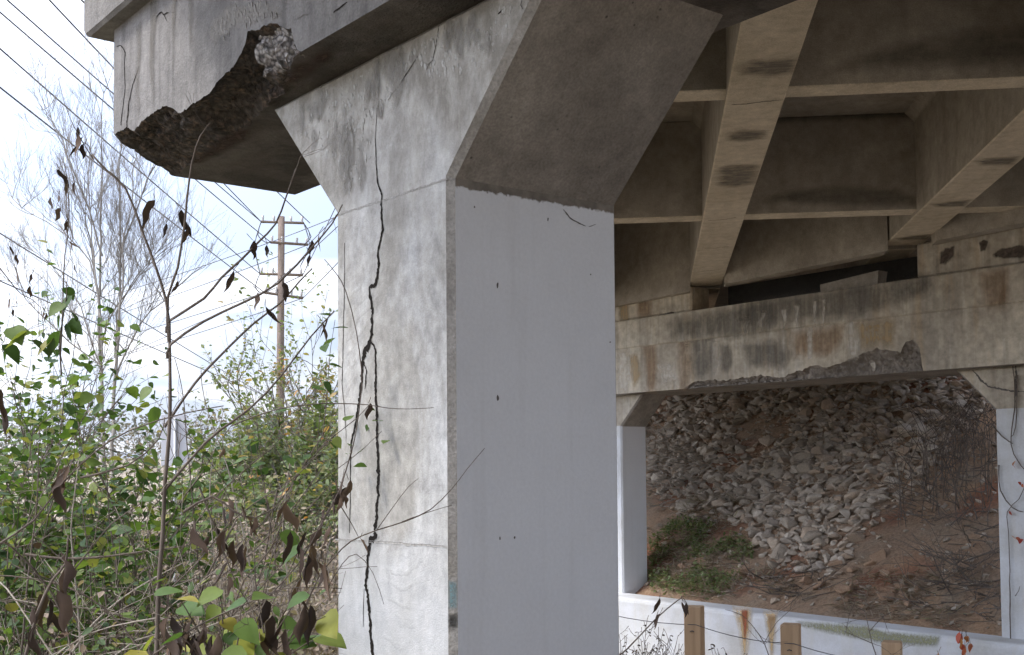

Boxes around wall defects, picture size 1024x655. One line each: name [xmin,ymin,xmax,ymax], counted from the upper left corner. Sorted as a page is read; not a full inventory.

leakage [748,60,792,74]
spalling [114,23,307,176]
leakage [732,132,763,140]
crack [342,28,439,655]
leakage [677,280,929,375]
rust [736,610,750,653]
rust [766,613,776,651]